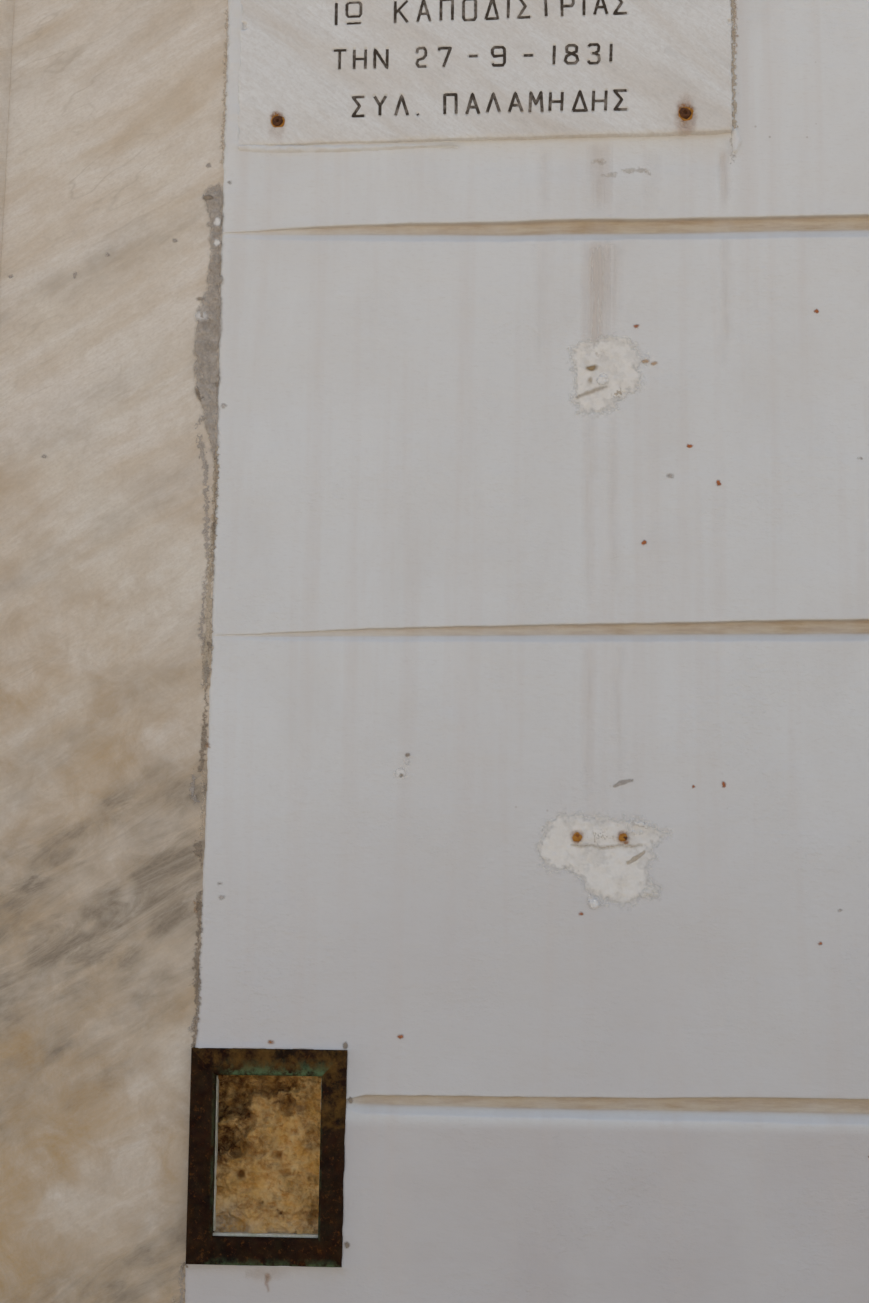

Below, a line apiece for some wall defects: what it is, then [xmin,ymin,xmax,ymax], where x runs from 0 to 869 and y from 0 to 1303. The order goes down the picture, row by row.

spalling [570,337,656,414]
spalling [538,813,665,908]